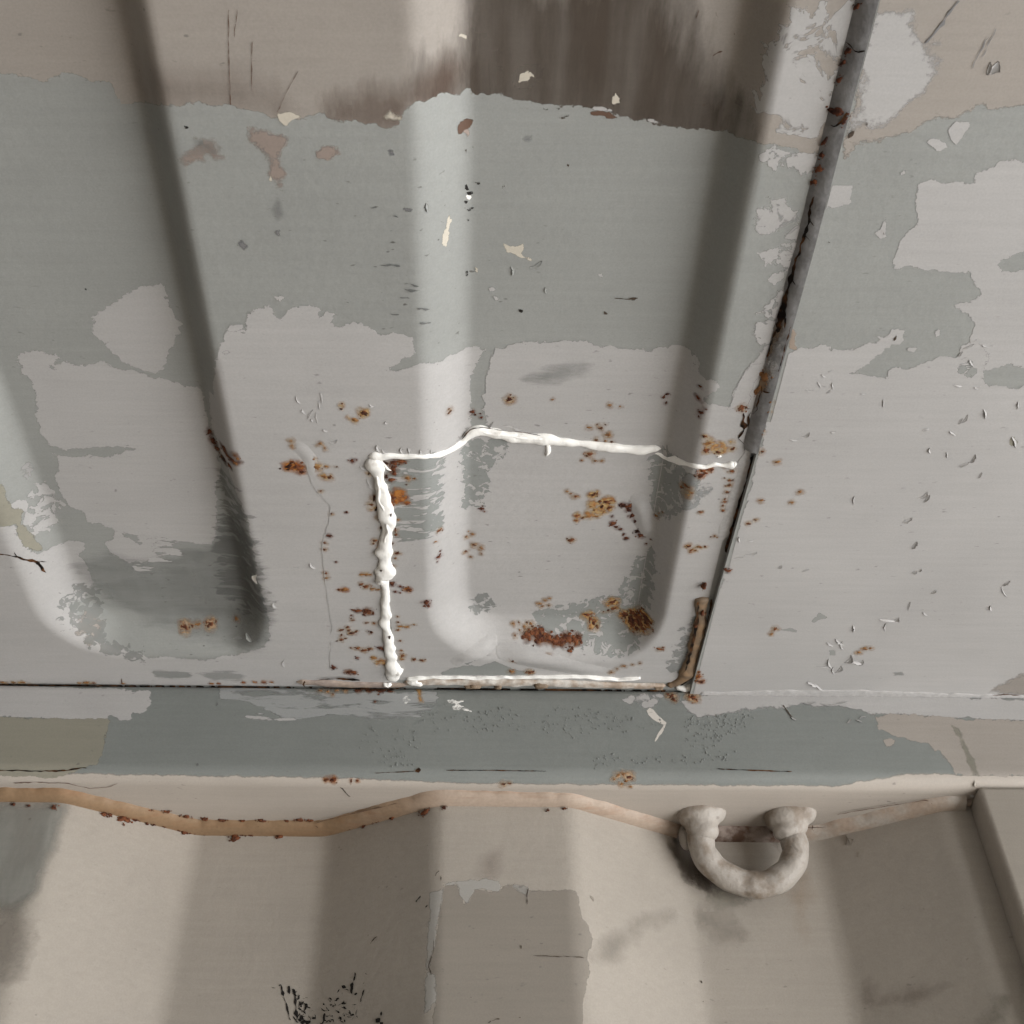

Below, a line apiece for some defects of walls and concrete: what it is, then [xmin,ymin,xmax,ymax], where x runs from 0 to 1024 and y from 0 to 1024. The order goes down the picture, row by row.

peeling [458,118,473,136]
peeling [590,93,620,119]
peeling [750,0,855,176]
peeling [849,10,941,129]
rust [736,320,784,413]
crack [738,197,814,450]
rust [279,439,357,492]
peeling [0,159,1024,695]
rust [566,490,651,545]
rust [511,598,654,655]
rust [654,582,707,704]
rust [100,809,269,836]